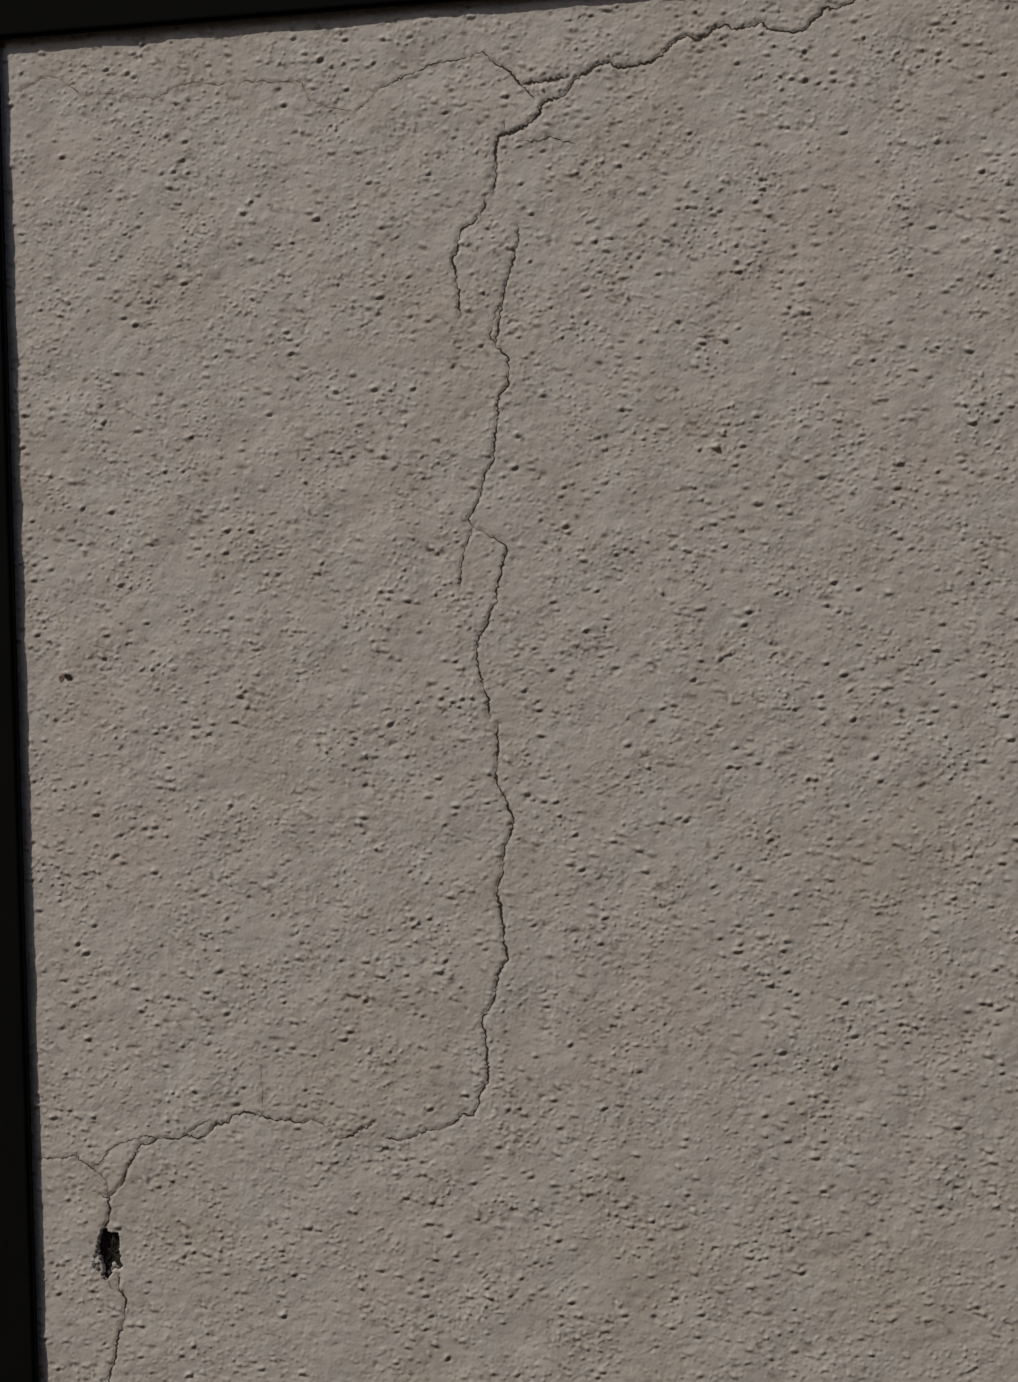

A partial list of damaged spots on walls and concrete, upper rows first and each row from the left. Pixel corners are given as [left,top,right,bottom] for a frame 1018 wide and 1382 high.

crack [21,0,854,324]
crack [38,228,520,1226]
hole [91,1228,123,1279]
crack [108,1273,127,1382]